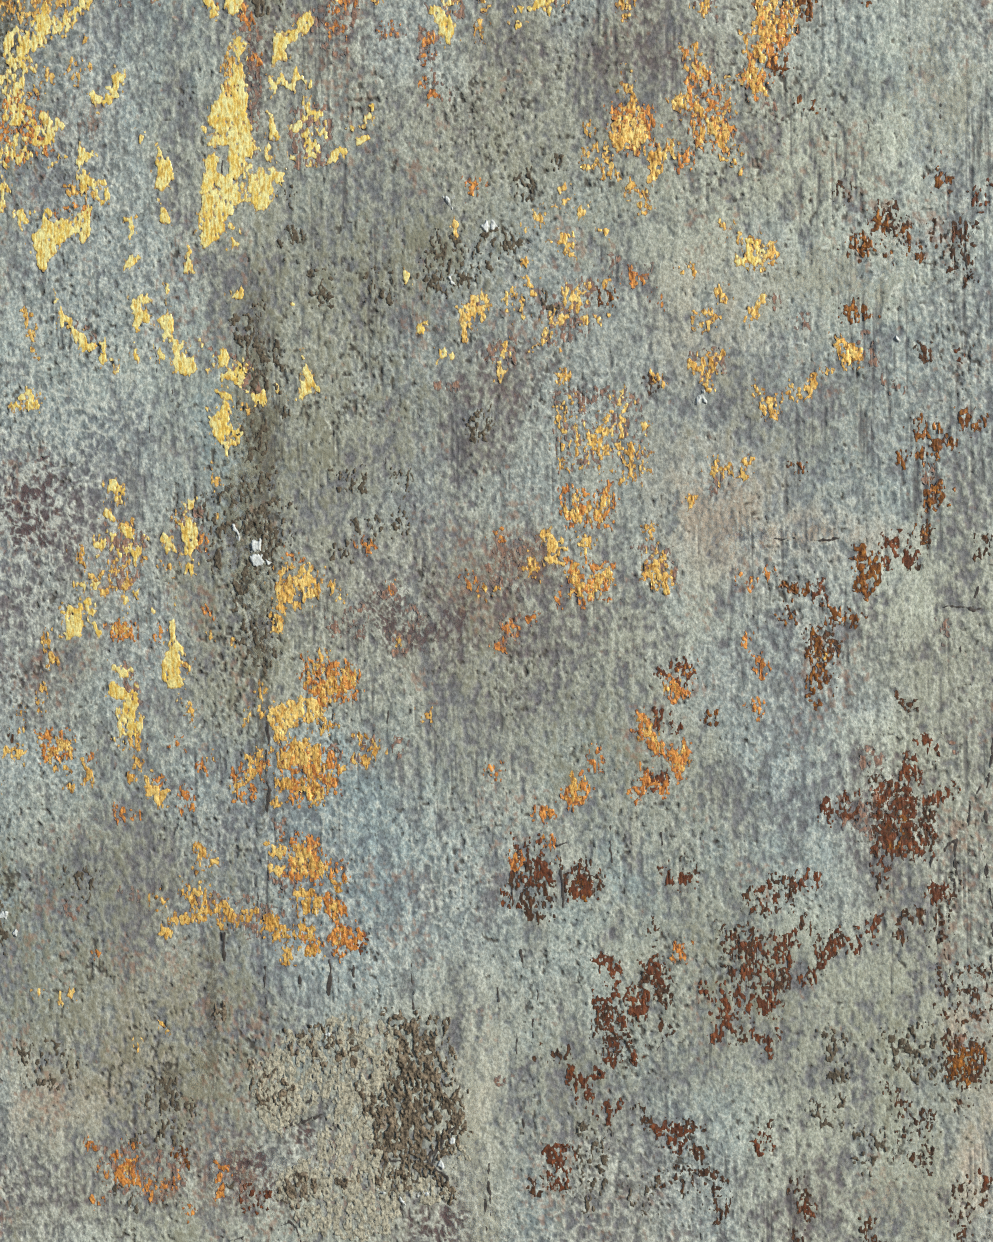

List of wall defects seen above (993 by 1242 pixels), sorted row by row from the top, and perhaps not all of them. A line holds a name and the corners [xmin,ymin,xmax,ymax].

rust [913,340,933,364]
rust [880,373,908,396]
rust [734,397,989,713]
rust [973,533,993,562]
rust [742,696,767,722]
rust [483,760,506,784]
rust [584,743,606,774]
rust [500,797,606,925]
rust [698,732,993,1118]
rust [526,915,733,1225]
rust [748,1119,779,1157]
rust [880,1079,942,1176]